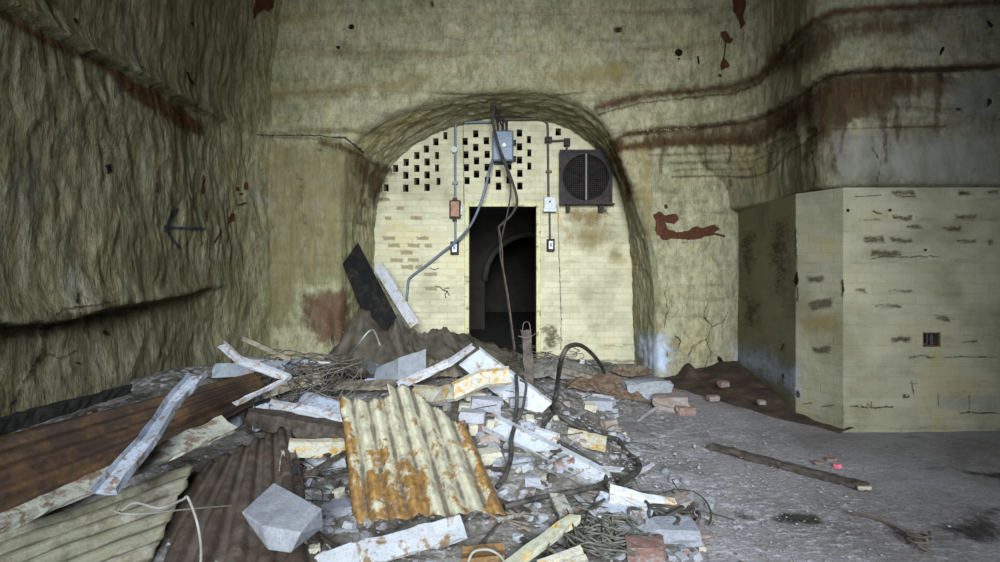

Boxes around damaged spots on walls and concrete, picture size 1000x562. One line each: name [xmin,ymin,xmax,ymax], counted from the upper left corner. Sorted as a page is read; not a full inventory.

rust [0,11,202,134]
rust [595,0,1000,115]
crack [257,134,364,155]
rust [609,63,1000,201]
damp [638,336,669,372]